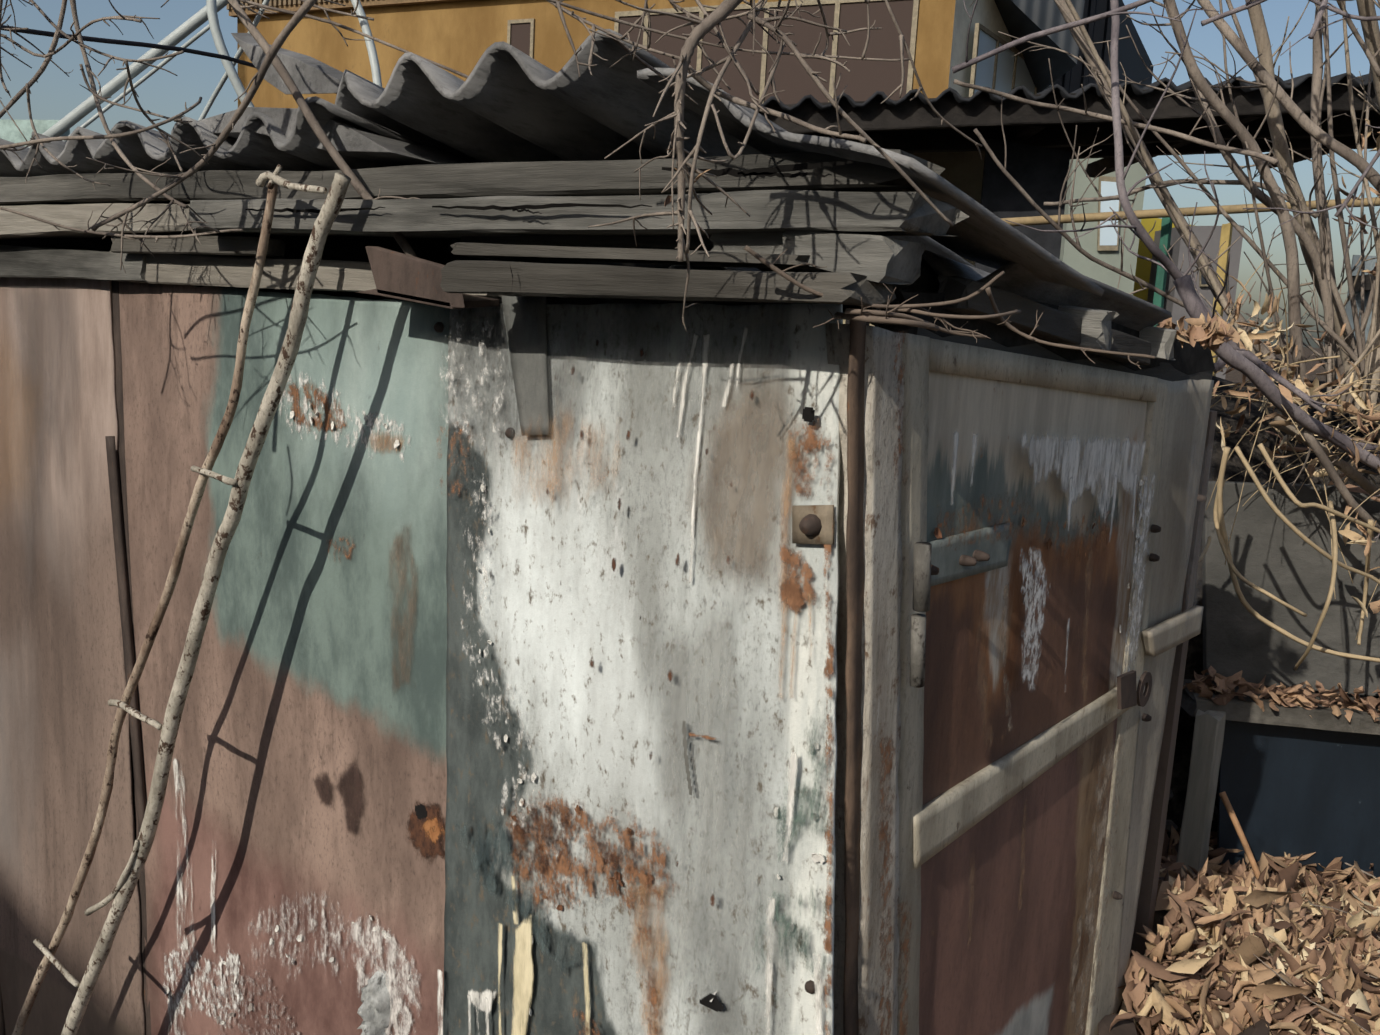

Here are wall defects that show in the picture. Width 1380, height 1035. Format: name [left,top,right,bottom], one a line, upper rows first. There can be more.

crack [432,203,652,214]
crack [662,161,856,178]
peeling [461,480,492,628]
peeling [463,629,530,749]
rust [780,418,834,1035]
peeling [163,759,419,1035]
rust [422,817,445,843]
peeling [456,764,578,974]
rust [503,796,674,1035]
rust [1071,737,1123,1035]
peeling [468,989,496,1035]